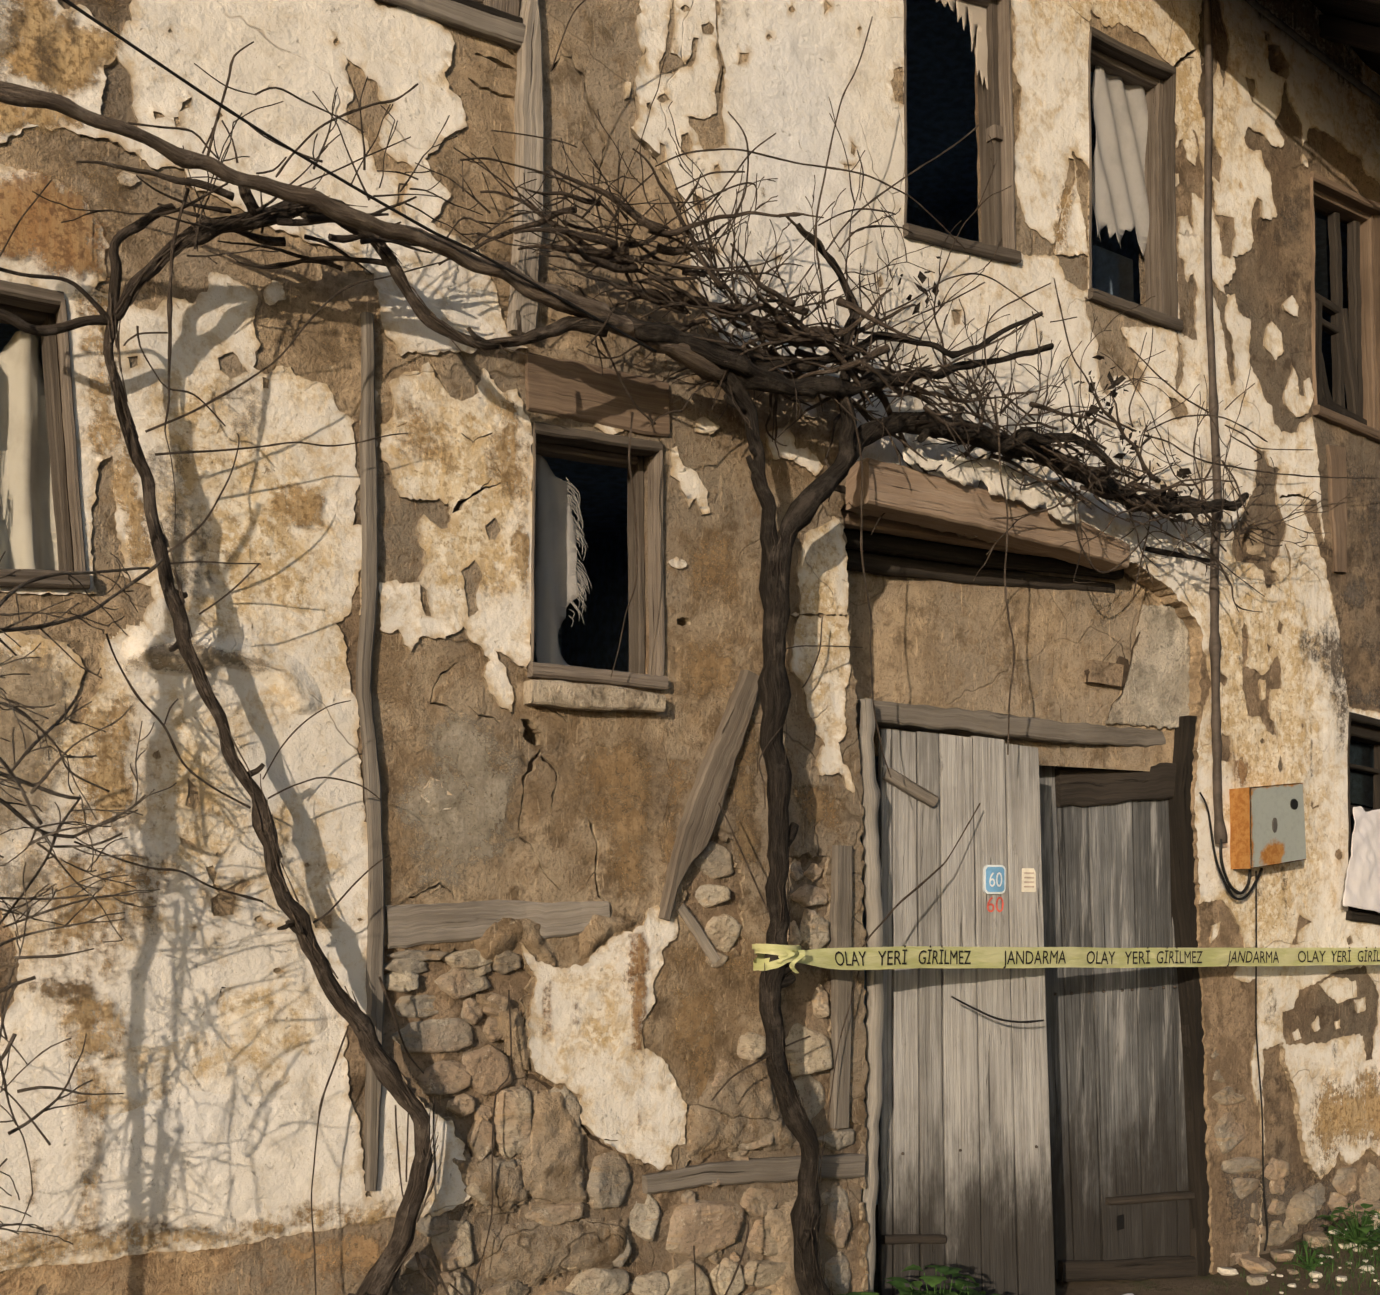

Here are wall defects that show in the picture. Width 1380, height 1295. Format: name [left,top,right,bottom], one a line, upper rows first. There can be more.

peeling [1015,153,1160,395]
peeling [1169,0,1380,713]
leakage [0,653,142,834]
leakage [126,641,269,673]
peeling [0,0,842,1295]
crack [521,753,557,798]
flaking render [781,477,870,1295]
peeling [1197,899,1244,948]
peeling [1199,622,1282,744]
leakage [0,853,395,1277]
flaking render [1201,965,1380,1275]
leakage [1220,1070,1380,1245]